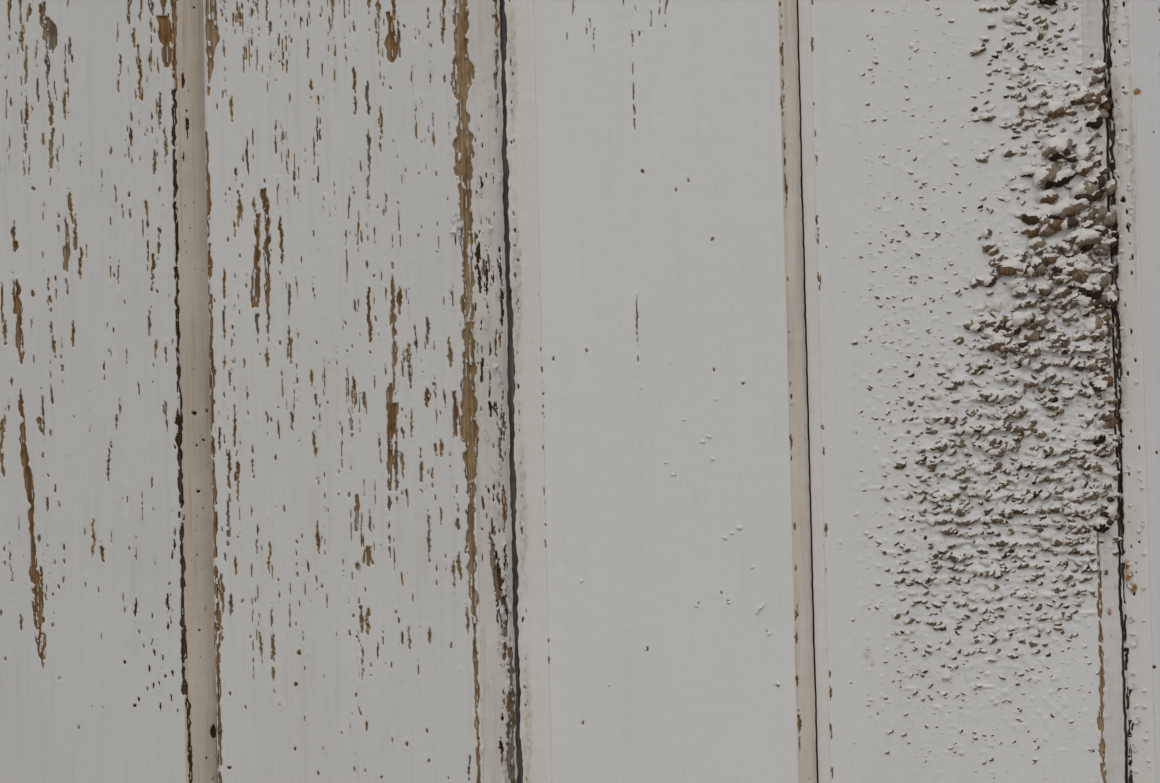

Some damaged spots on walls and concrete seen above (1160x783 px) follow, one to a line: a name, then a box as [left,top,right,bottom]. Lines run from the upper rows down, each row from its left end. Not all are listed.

peeling [1,0,73,191]
peeling [109,0,178,192]
peeling [101,171,169,297]
peeling [0,188,87,669]
peeling [107,399,121,481]
peeling [148,306,173,367]
peeling [205,0,528,783]
peeling [84,519,112,562]
peeling [123,593,174,707]